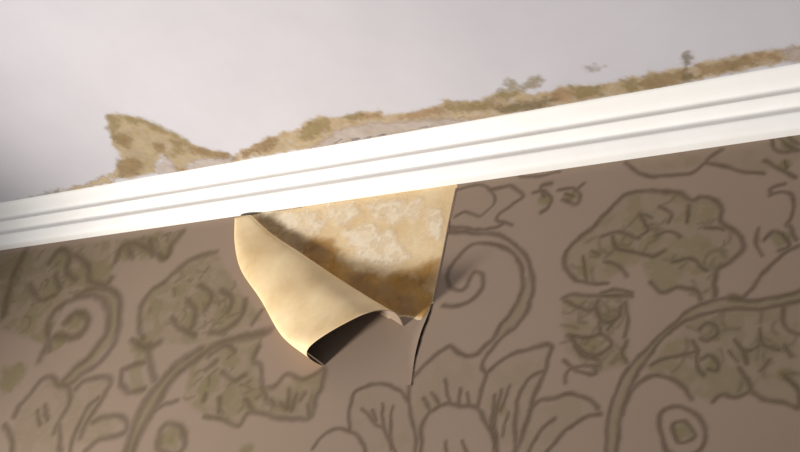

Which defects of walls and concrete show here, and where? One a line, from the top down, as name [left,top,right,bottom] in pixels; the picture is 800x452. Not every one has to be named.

leakage [55,42,800,193]
flaking render [251,184,458,320]